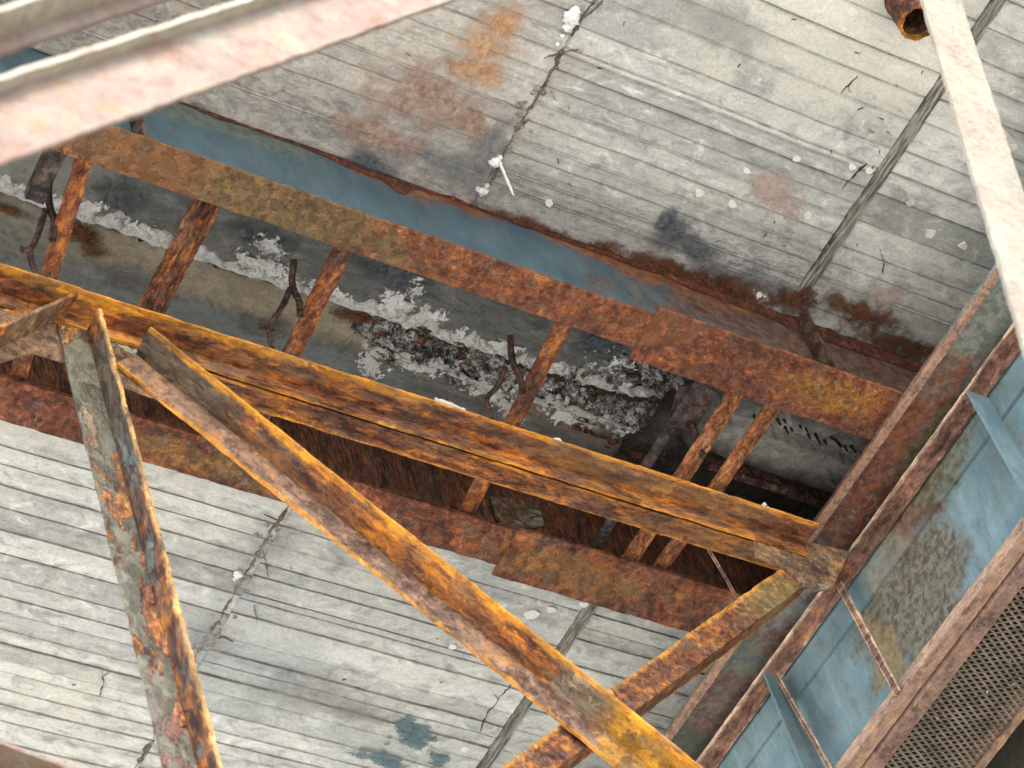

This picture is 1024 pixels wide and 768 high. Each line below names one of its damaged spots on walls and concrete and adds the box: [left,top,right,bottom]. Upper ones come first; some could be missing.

crack [488,0,603,189]
corrosion [70,222,105,257]
damp [76,181,173,249]
damp [194,224,316,296]
corrosion [330,310,390,339]
damp [328,257,536,369]
spalling [350,314,530,401]
damp [548,335,659,398]
spalling [536,350,686,441]
corrosion [491,210,935,363]
crack [191,506,289,659]
crack [135,733,155,768]